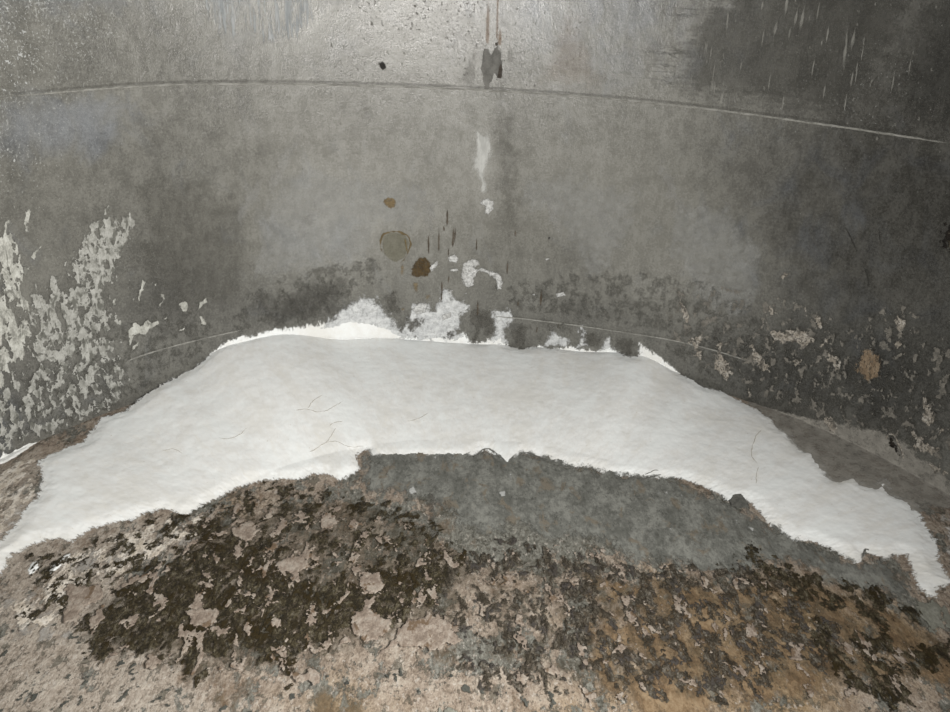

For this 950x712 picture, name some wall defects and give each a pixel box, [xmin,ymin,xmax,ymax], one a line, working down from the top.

damp [481,46,502,90]
rust [401,211,456,290]
peeling [0,205,167,453]
peeling [179,298,207,325]
damp [384,292,425,332]
damp [470,310,496,341]
peeling [666,284,950,475]
damp [749,402,950,512]